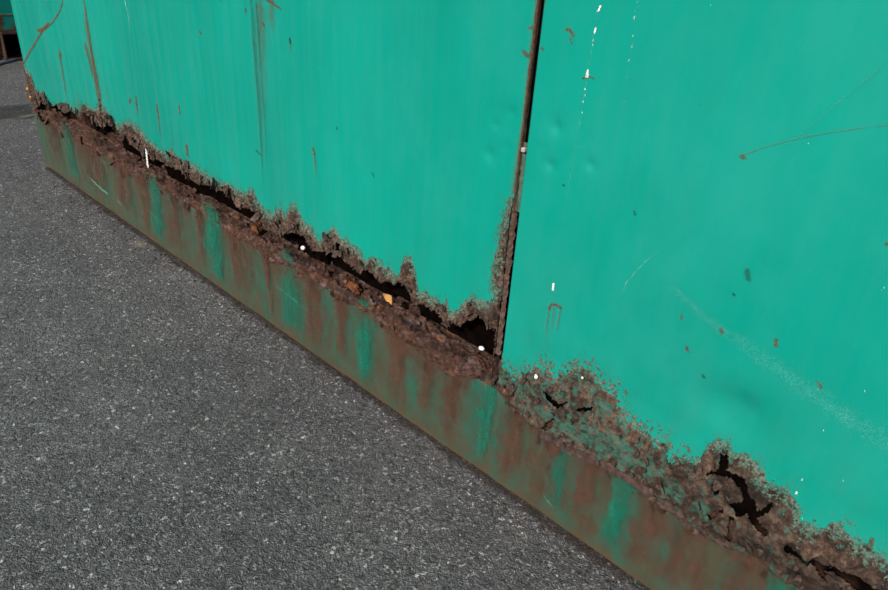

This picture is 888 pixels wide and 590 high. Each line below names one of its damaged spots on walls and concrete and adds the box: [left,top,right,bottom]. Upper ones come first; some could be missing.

rust [23,0,542,387]
spalling [282,233,507,360]
rust [494,353,888,590]
crack [707,453,829,578]